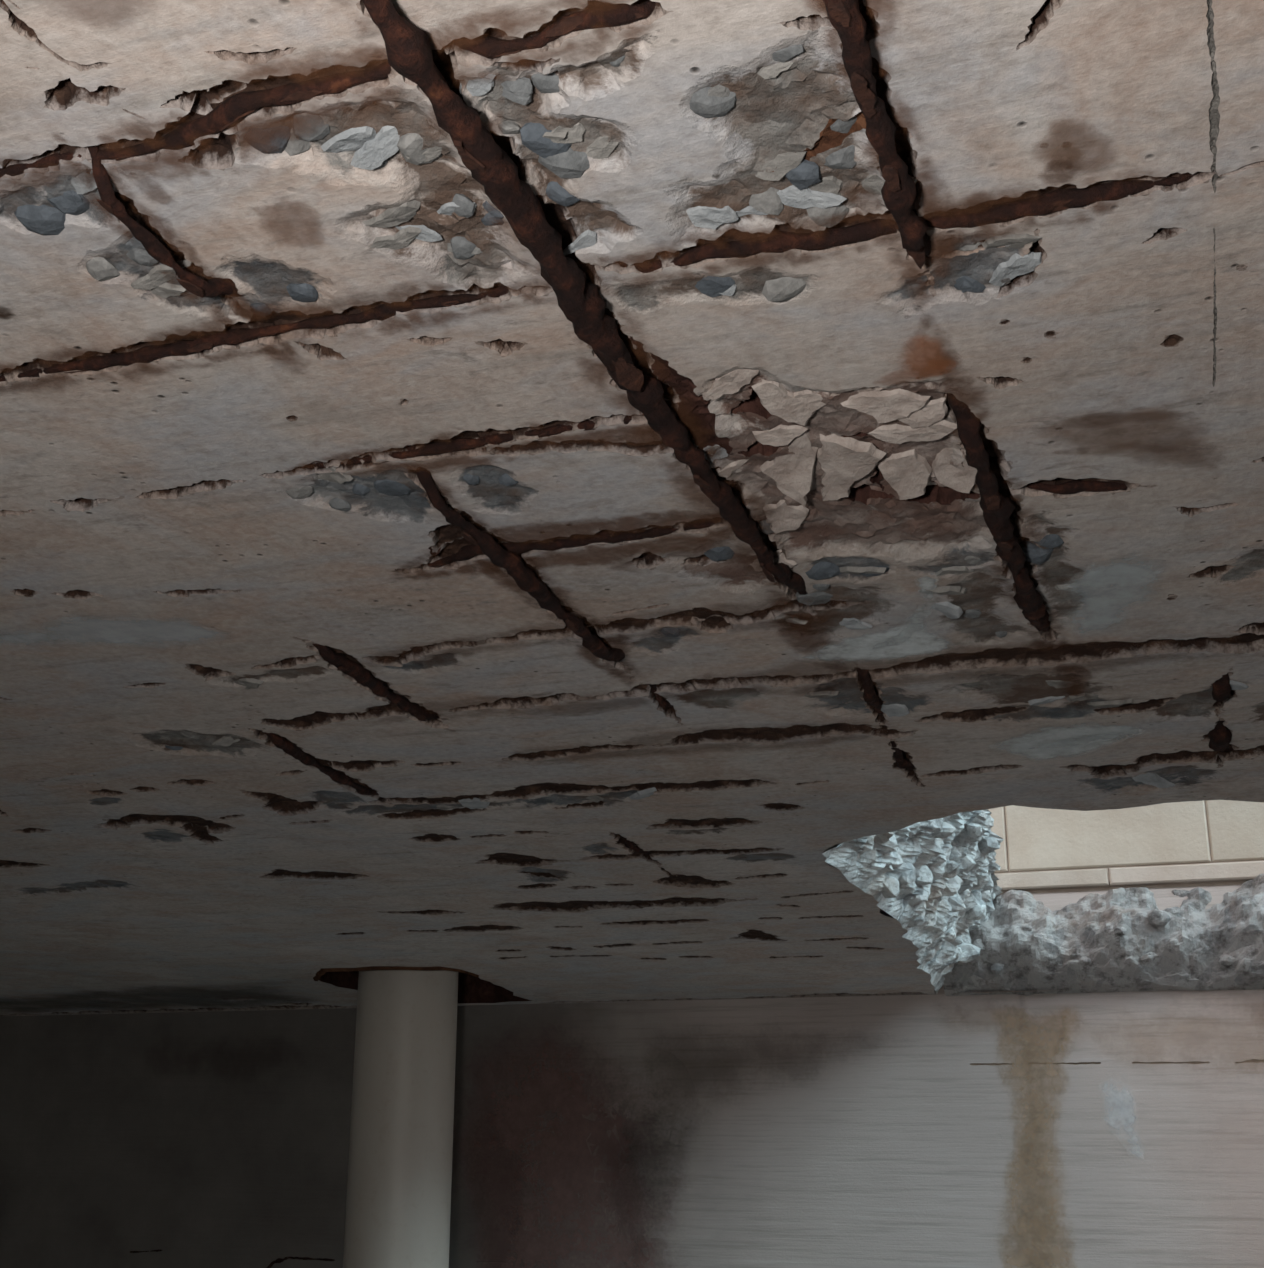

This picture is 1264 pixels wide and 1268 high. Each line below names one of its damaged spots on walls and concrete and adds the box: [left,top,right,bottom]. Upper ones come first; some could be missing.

crack [1016,0,1066,51]
crack [1206,0,1220,193]
rust [687,229,776,245]
rust [920,172,1022,216]
spalling [0,0,1264,732]
crack [838,466,980,505]
rust [740,548,831,652]
crack [261,598,1264,731]
crack [1059,744,1264,779]
crack [65,706,1030,960]
spalling [822,809,1264,996]
spalling [313,966,531,1003]